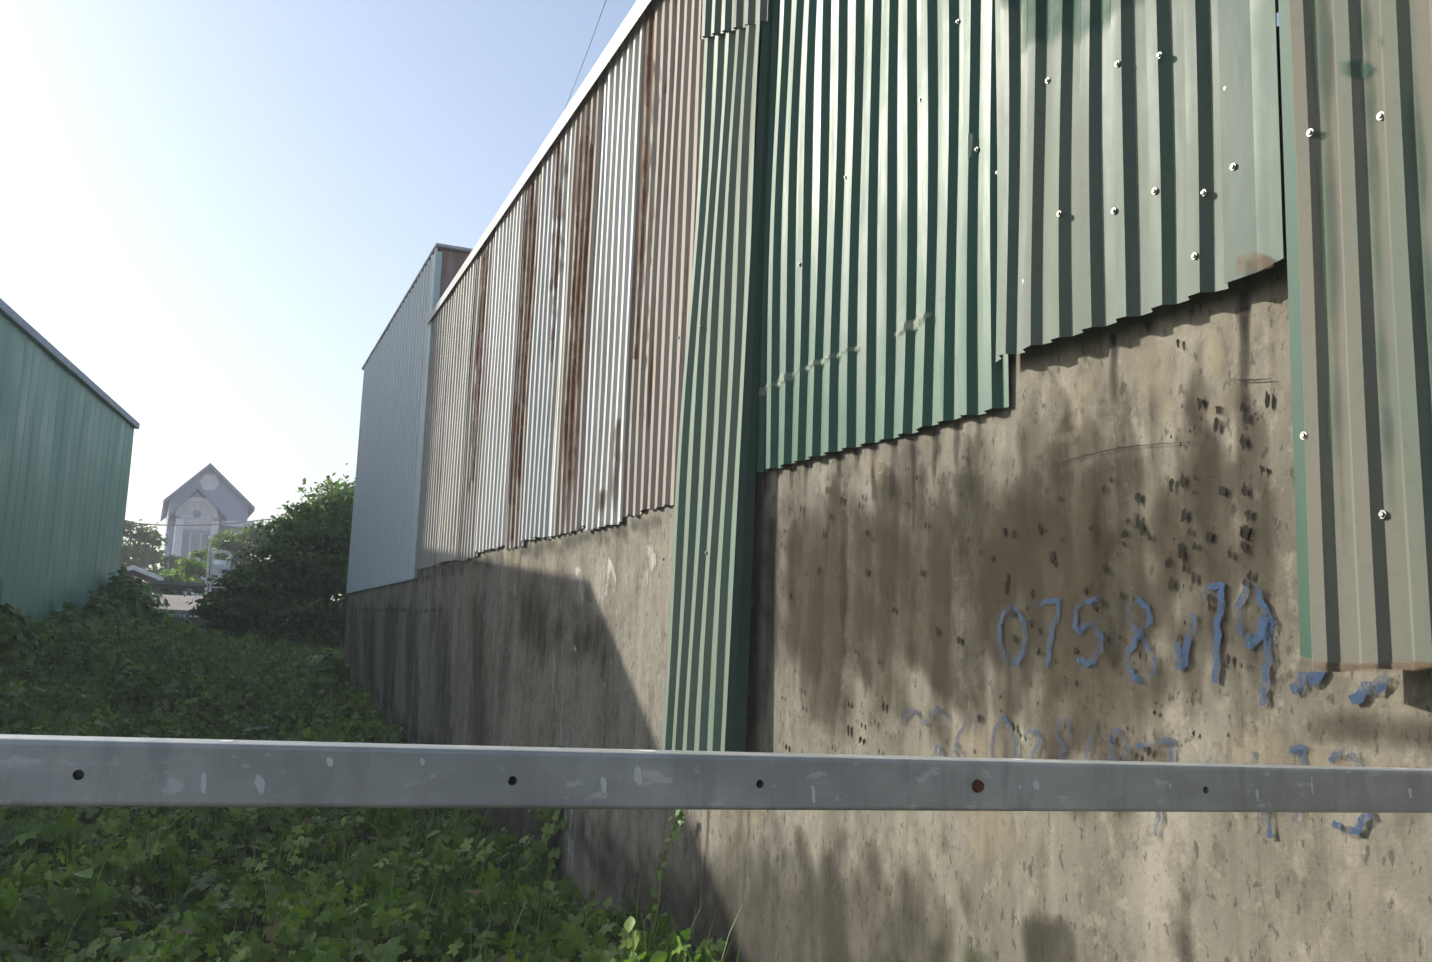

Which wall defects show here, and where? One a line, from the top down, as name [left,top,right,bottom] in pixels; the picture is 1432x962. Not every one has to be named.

rust [643,12,669,119]
rust [509,182,536,540]
rust [550,97,594,519]
rust [598,420,622,507]
rust [633,134,665,362]
leakage [767,431,1214,762]
leakage [1170,397,1221,447]
leakage [1213,476,1252,586]
leakage [1238,293,1270,451]
leakage [1227,733,1265,764]
leakage [476,809,944,962]